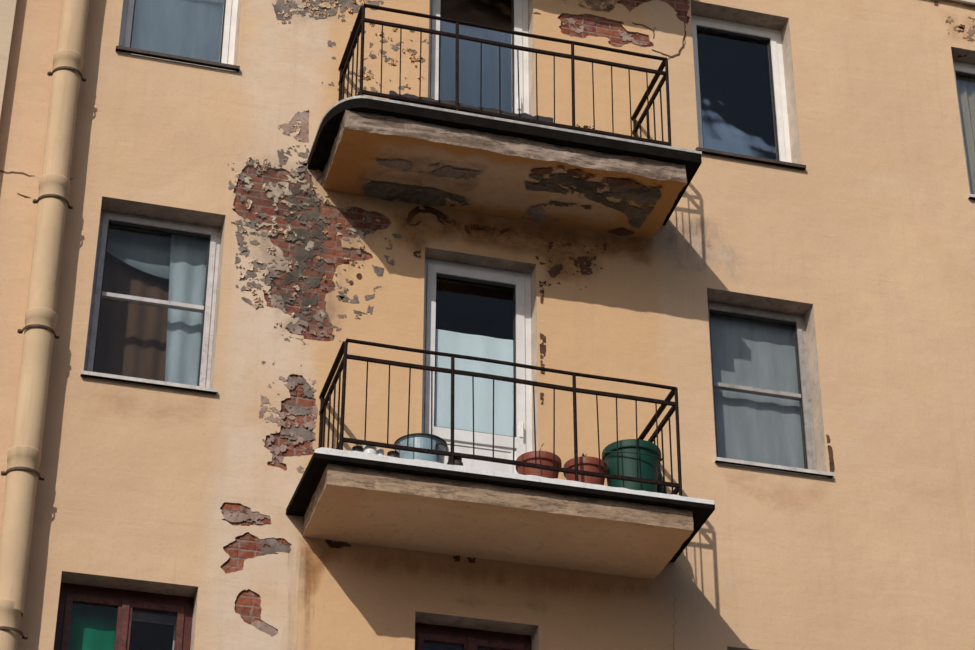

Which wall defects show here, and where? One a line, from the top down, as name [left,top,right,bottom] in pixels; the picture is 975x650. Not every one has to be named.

peeling [272,0,384,24]
peeling [558,0,654,46]
peeling [945,16,975,41]
peeling [349,23,429,92]
peeling [228,110,401,344]
peeling [363,182,510,235]
peeling [259,365,318,474]